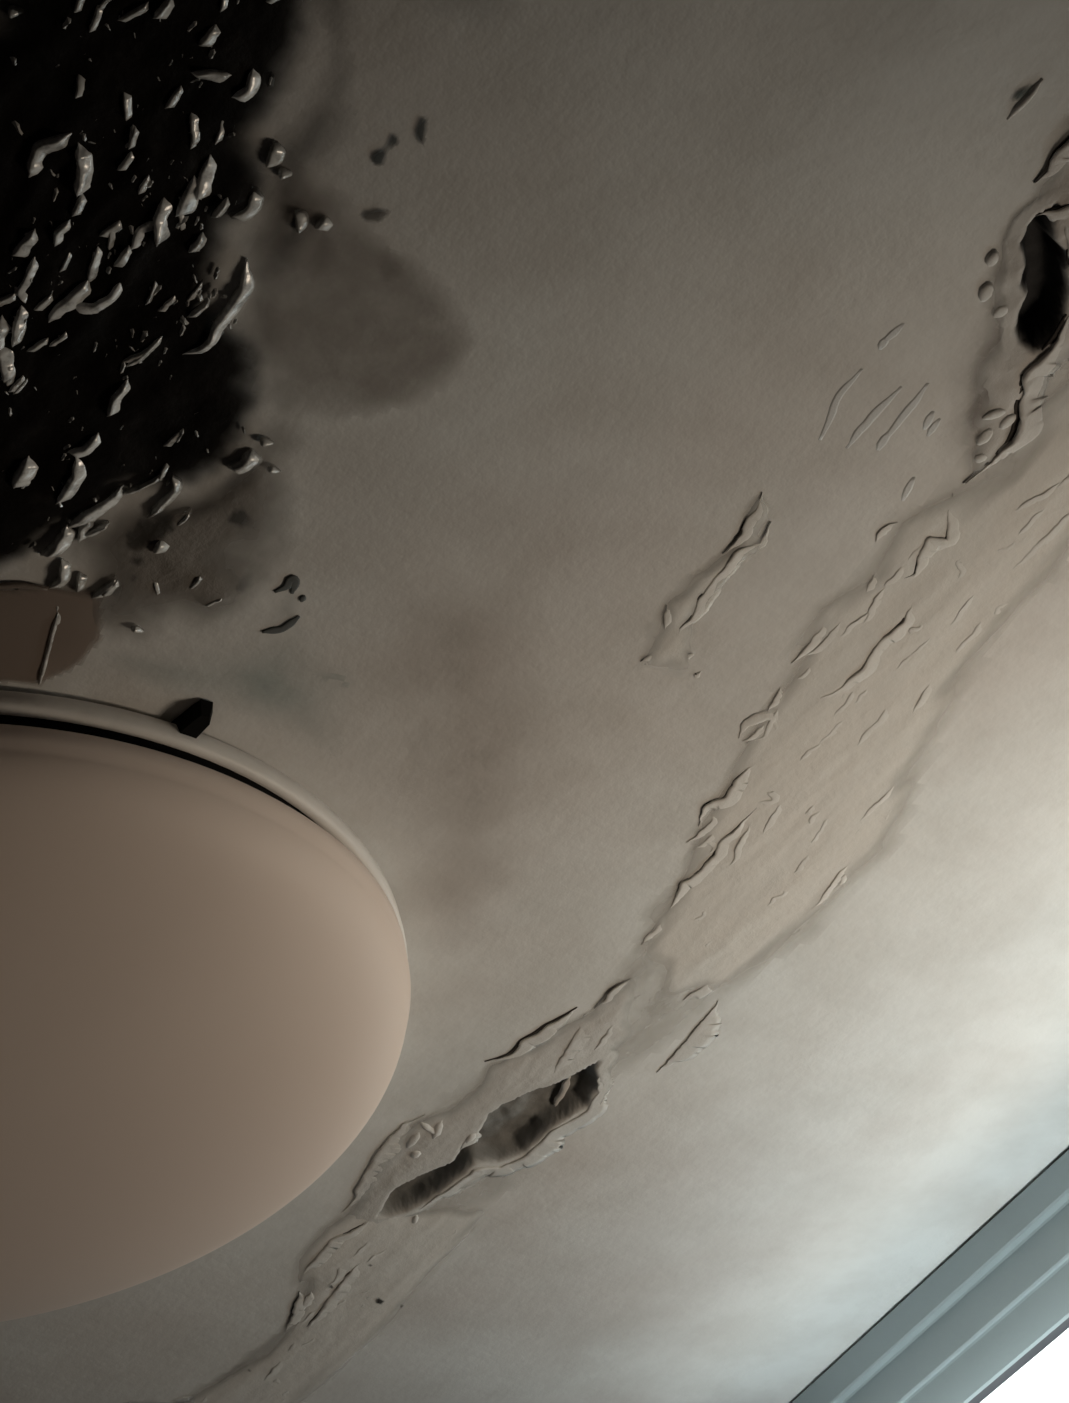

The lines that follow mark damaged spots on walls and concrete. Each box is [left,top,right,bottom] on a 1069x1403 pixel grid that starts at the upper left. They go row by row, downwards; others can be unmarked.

peeling [265,142,293,180]
peeling [233,192,265,221]
peeling [290,209,333,234]
peeling [364,211,388,222]
mould [0,0,304,599]
spalling [963,135,1069,484]
peeling [0,437,282,685]
water stain [262,574,306,634]
spalling [657,985,722,1072]
spalling [343,978,632,1224]